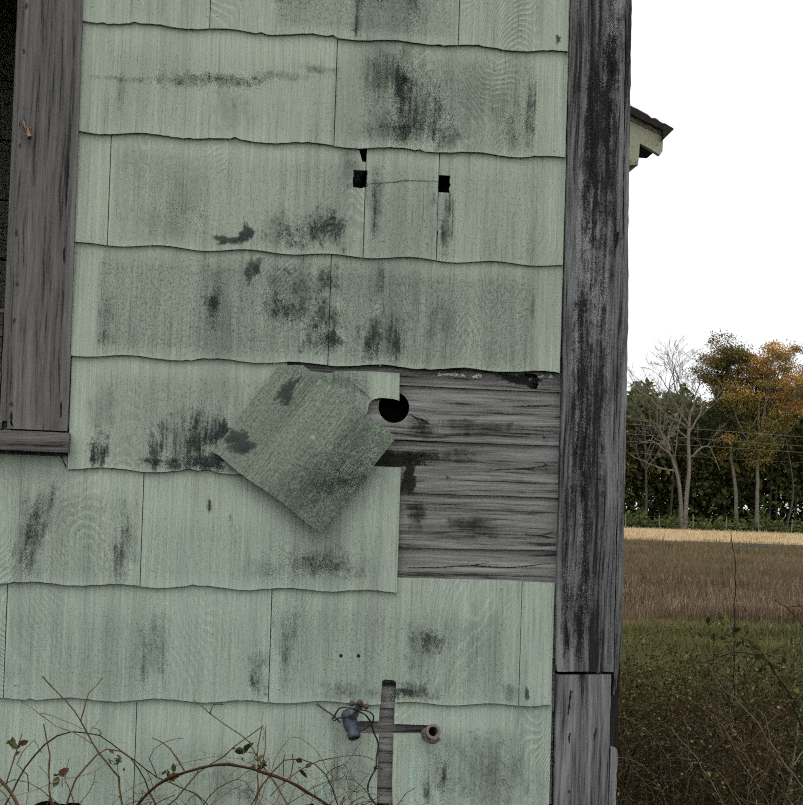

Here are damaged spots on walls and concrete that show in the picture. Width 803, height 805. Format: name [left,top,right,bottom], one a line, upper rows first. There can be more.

mould [373,54,459,147]
mould [271,267,345,352]
mould [359,310,403,359]
mould [144,414,256,472]